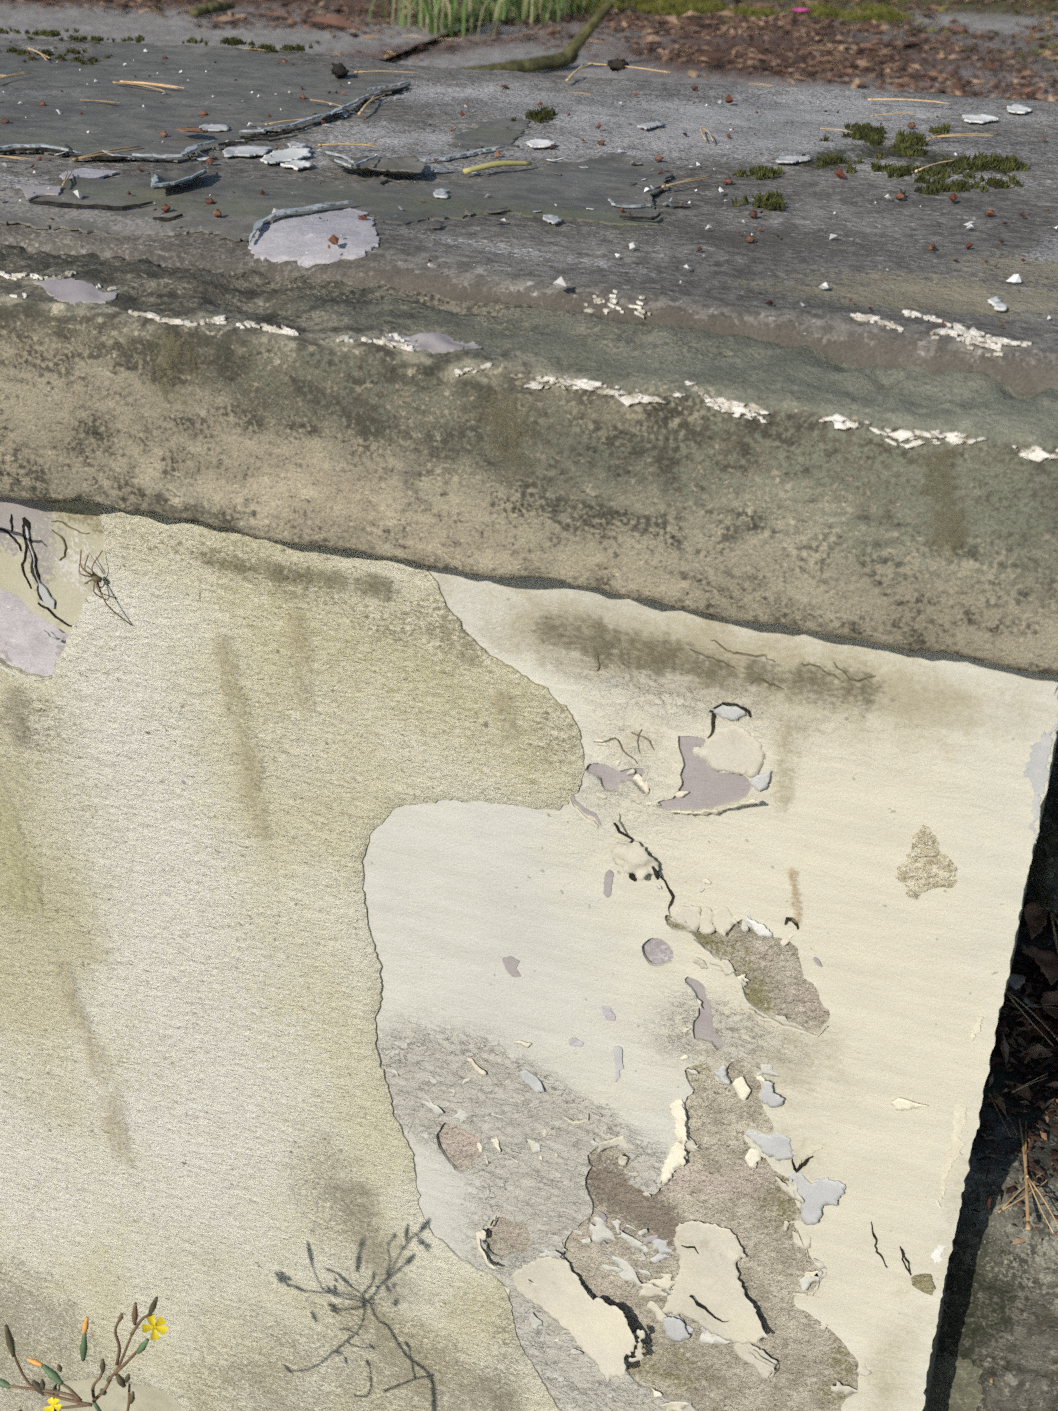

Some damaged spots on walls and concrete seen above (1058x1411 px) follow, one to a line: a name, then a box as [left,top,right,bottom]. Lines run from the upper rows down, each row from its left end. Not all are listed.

peeling [0,38,689,268]
peeling [584,289,650,318]
peeling [988,296,1007,311]
peeling [850,310,1031,356]
peeling [524,375,769,423]
peeling [819,414,987,448]
peeling [1012,445,1058,462]
crack [0,514,88,627]
peeling [0,497,106,681]
peeling [362,567,1058,1411]
peeling [53,1378,184,1411]